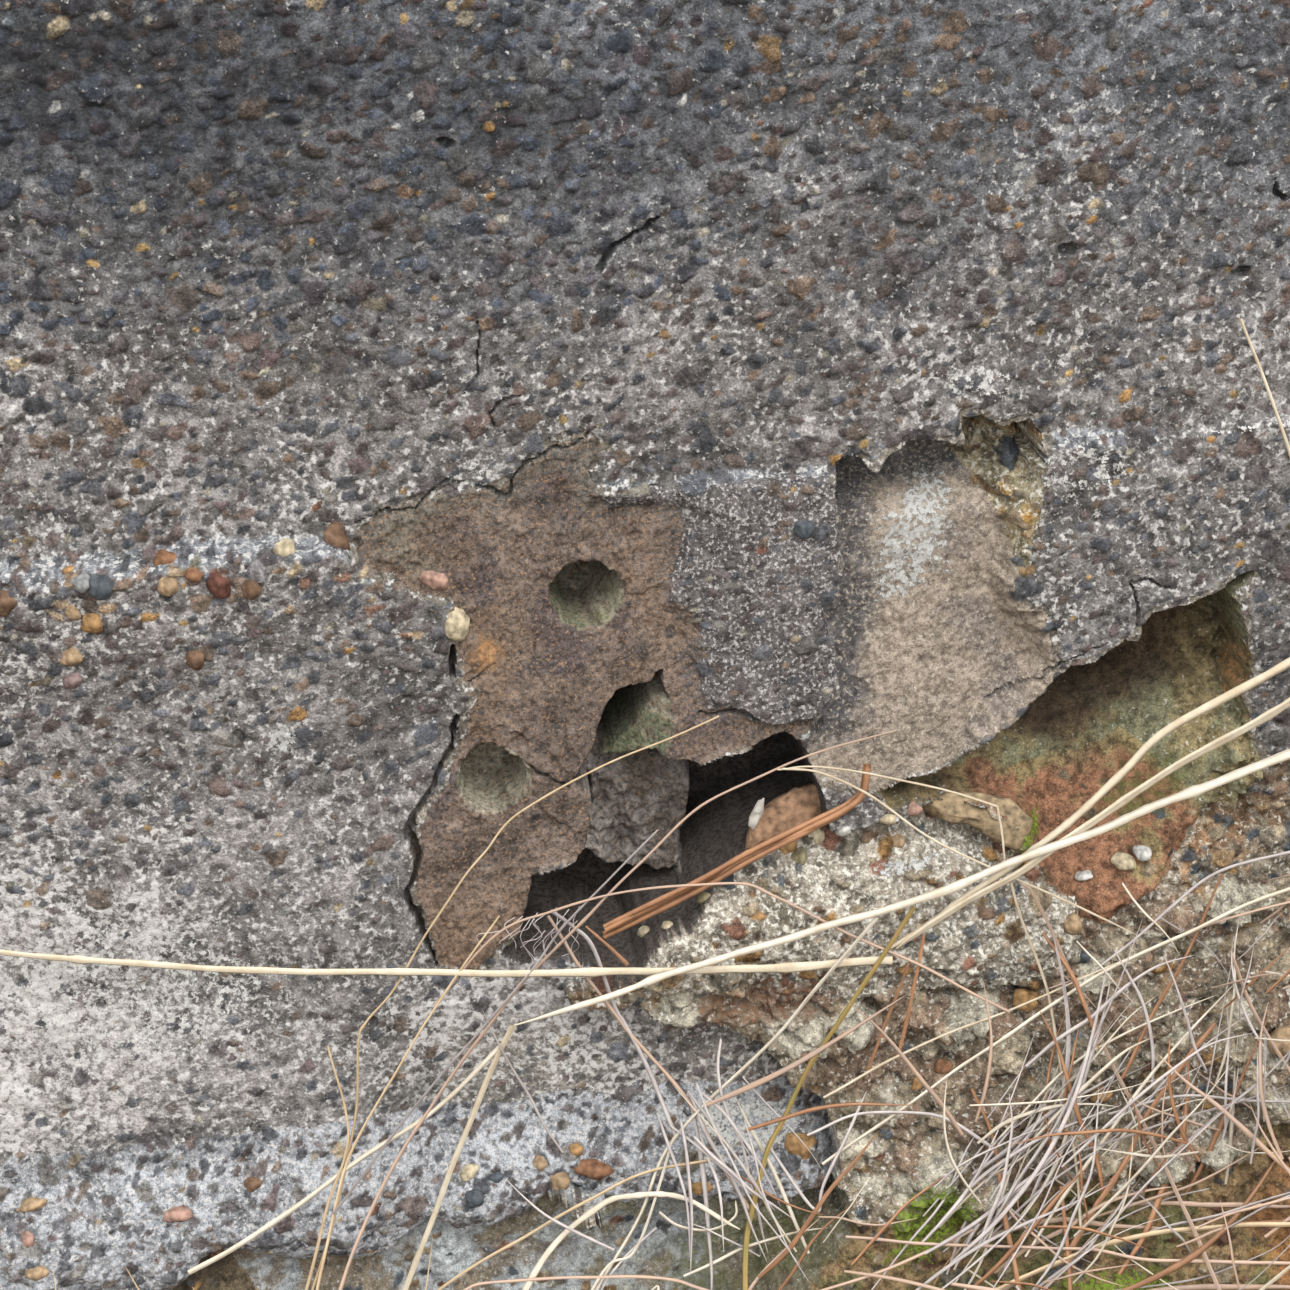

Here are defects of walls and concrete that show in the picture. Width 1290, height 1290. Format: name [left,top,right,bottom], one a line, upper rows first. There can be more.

crack [596,215,661,273]
spalling [350,408,1269,988]
crack [404,714,461,965]